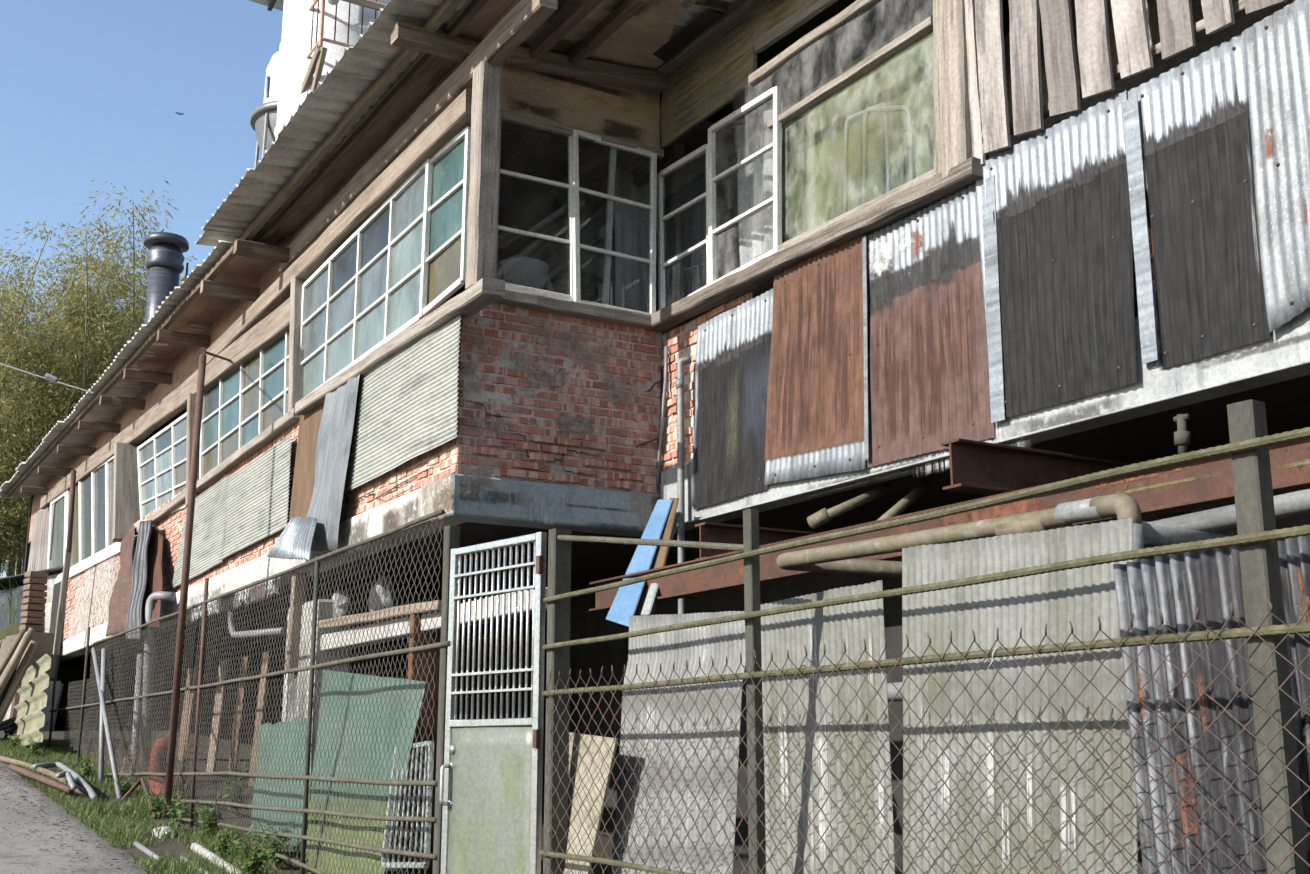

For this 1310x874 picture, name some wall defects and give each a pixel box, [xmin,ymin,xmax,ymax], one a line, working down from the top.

corrosion [764,234,995,468]
corrosion [941,496,1041,527]
corrosion [1098,466,1188,488]
corrosion [1176,757,1198,834]